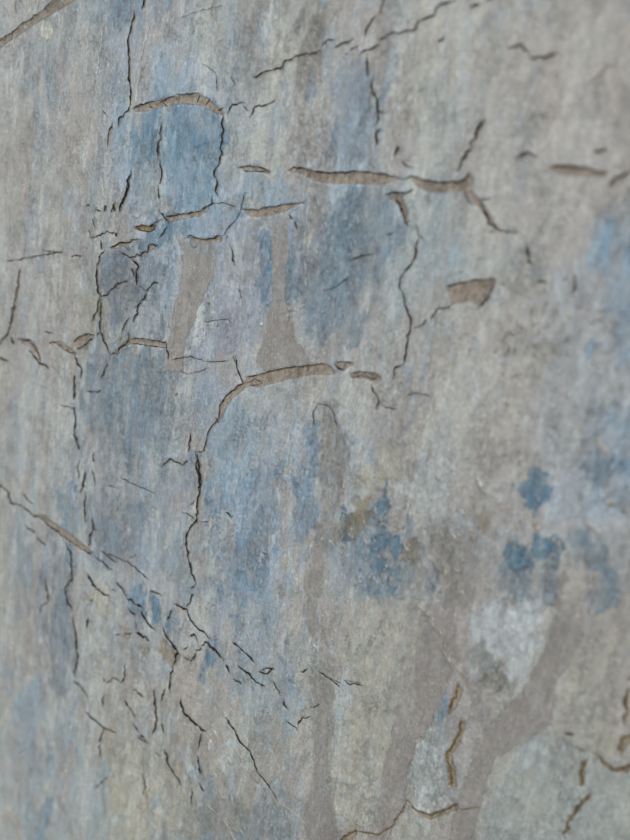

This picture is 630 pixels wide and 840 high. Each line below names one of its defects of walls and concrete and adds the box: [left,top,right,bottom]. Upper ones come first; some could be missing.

crack [253,0,576,410]
flaking render [431,278,496,318]
crack [0,0,319,821]
crack [302,669,364,688]
crack [340,682,480,840]